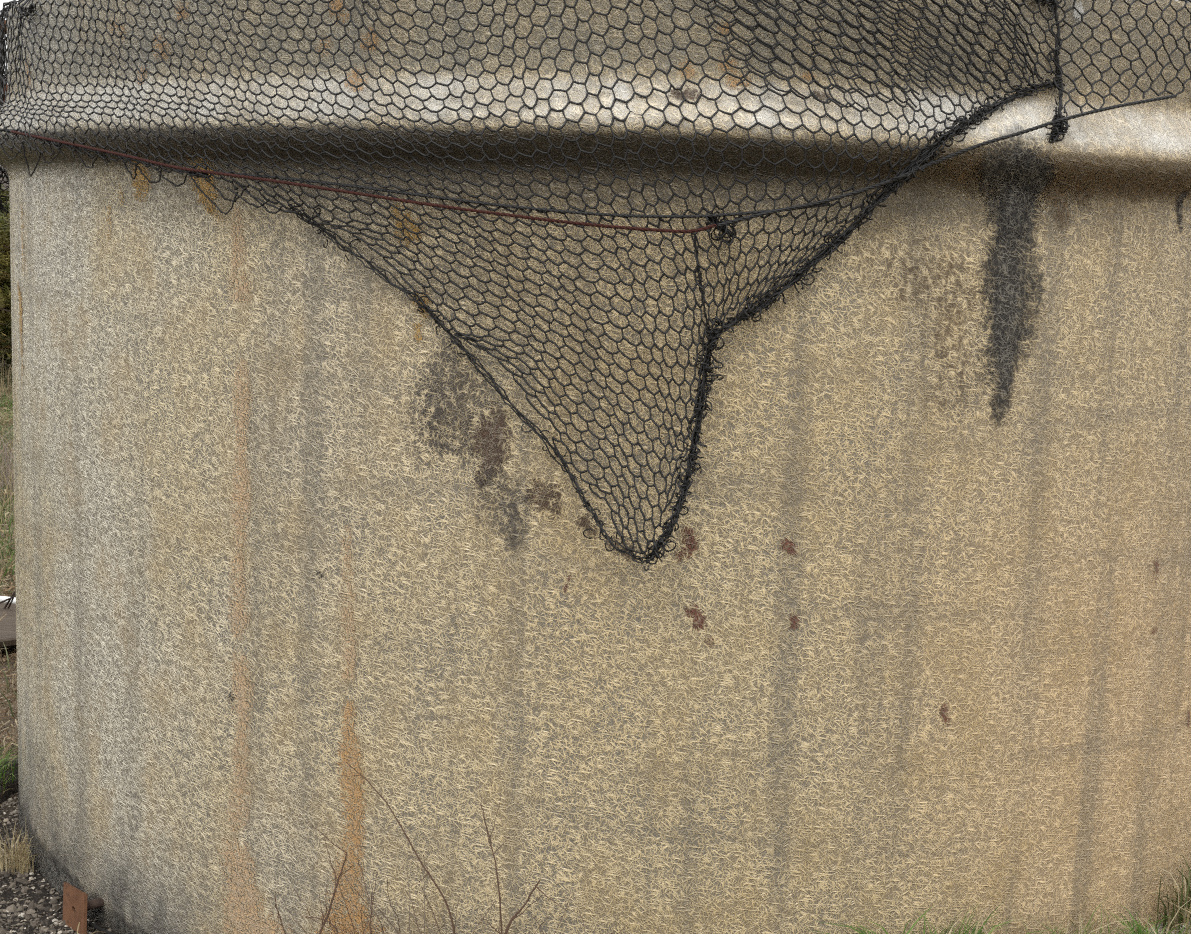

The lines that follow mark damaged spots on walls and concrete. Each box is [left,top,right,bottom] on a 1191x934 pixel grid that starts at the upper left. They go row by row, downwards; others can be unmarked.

leakage [876,127,1191,425]
corrosion [228,359,252,640]
leakage [409,394,444,463]
leakage [471,404,562,550]
leakage [577,514,597,537]
corrosion [220,653,291,934]
corrosion [314,701,385,934]